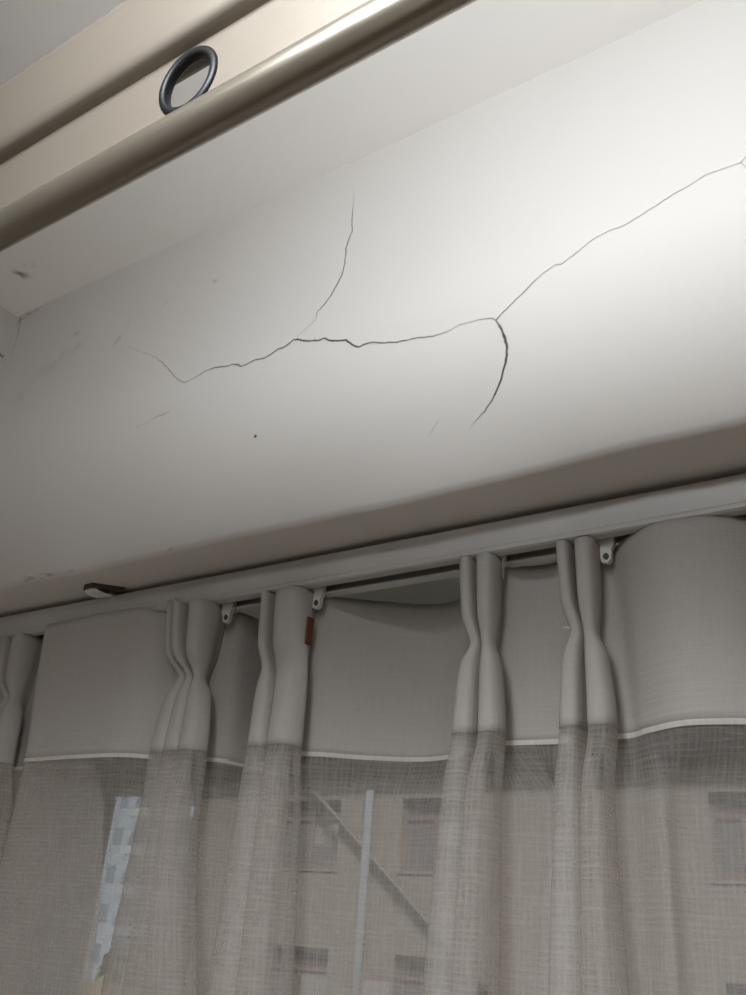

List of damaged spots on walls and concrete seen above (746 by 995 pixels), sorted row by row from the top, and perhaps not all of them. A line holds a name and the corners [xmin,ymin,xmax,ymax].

crack [217,336,429,368]
crack [484,282,533,412]